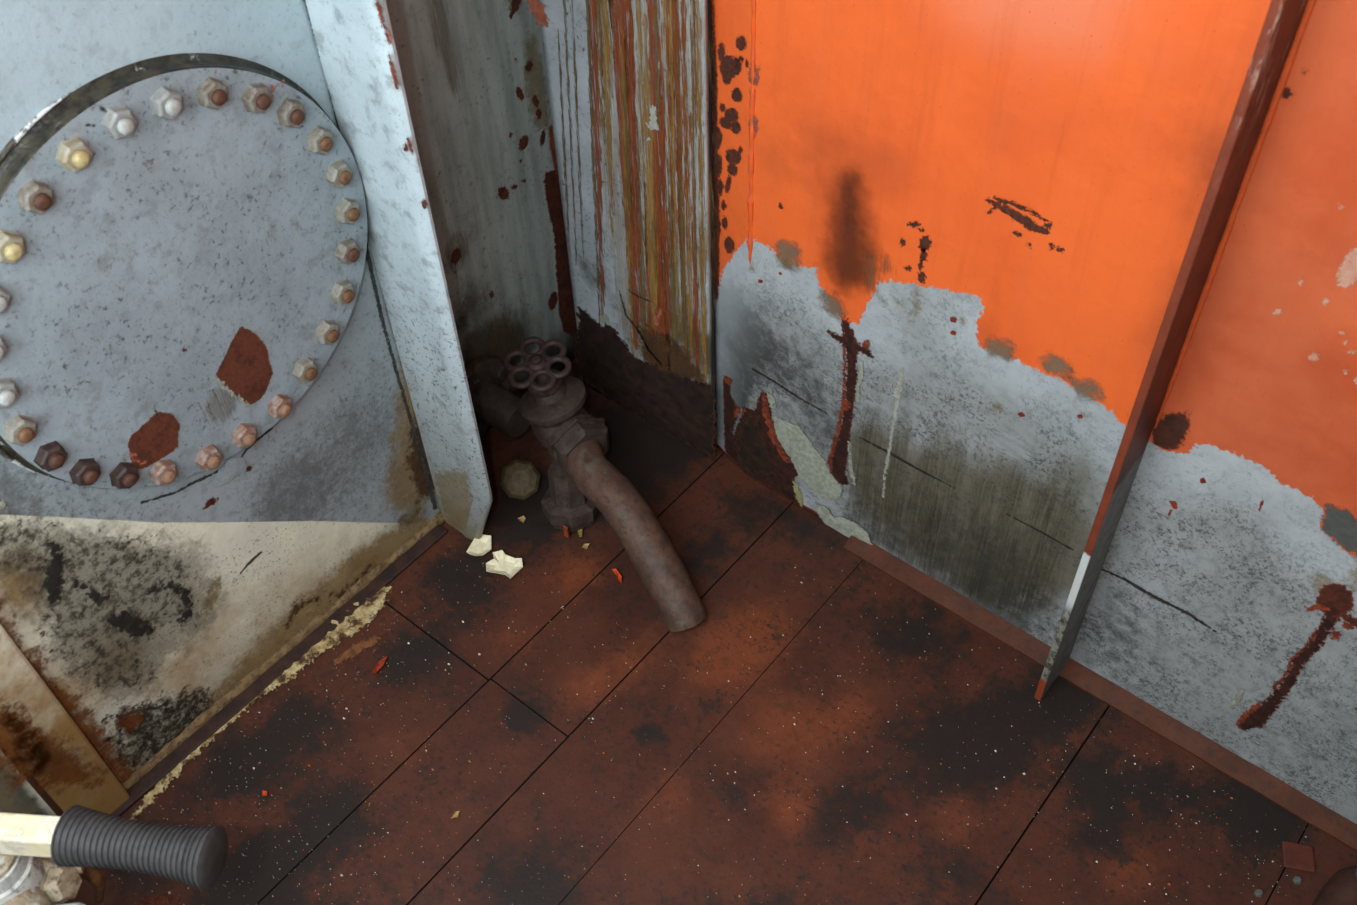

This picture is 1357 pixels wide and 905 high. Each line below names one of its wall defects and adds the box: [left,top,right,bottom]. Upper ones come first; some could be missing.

rust [542,0,717,460]
spalling [985,195,1065,253]
rust [0,551,135,794]
mould [0,519,213,771]
rust [209,371,435,704]
peeling [722,376,873,545]
rust [826,315,874,486]
rust [1227,583,1357,731]